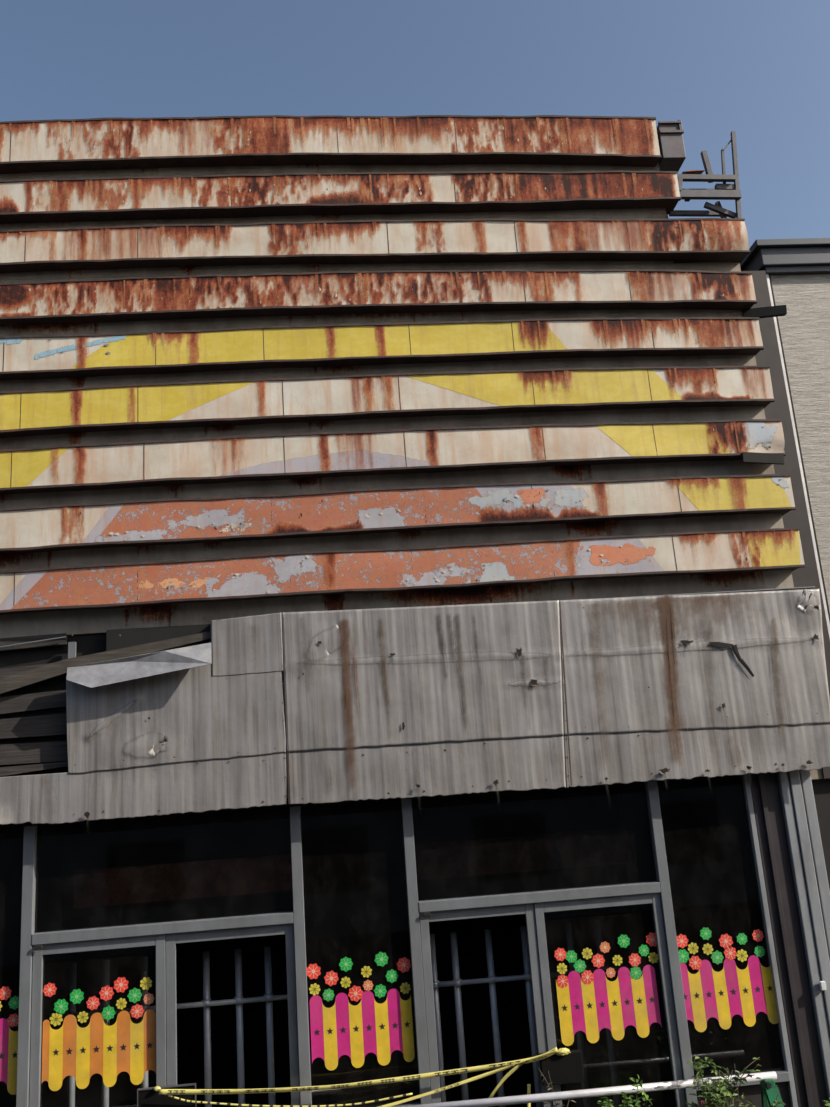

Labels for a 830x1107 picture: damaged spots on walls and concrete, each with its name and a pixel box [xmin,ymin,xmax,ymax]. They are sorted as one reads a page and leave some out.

rust [547,220,742,251]
rust [626,271,750,301]
rust [0,117,676,488]
rust [591,319,755,349]
rust [665,368,753,400]
peeling [772,476,789,489]
peeling [468,487,588,515]
peeling [356,507,407,529]
peeling [581,543,656,566]
peeling [397,562,516,587]